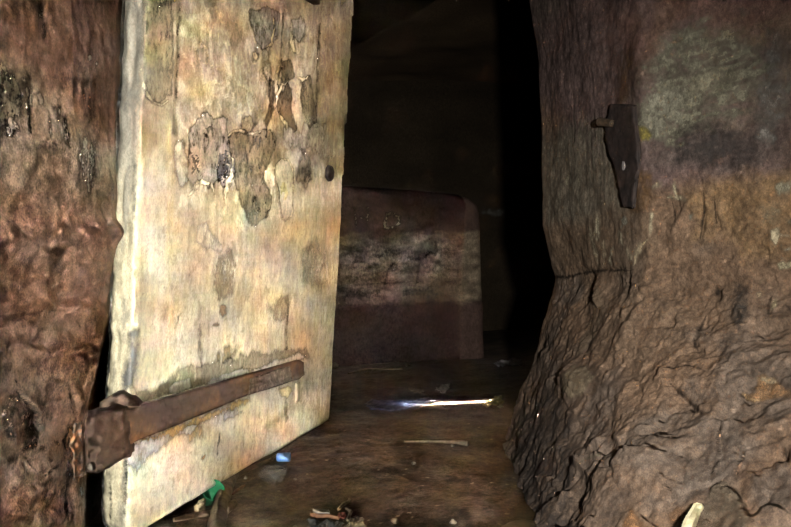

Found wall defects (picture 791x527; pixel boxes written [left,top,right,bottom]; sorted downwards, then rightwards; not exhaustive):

crack [557,269,631,279]
crack [660,317,706,416]
corrosion [142,399,250,443]